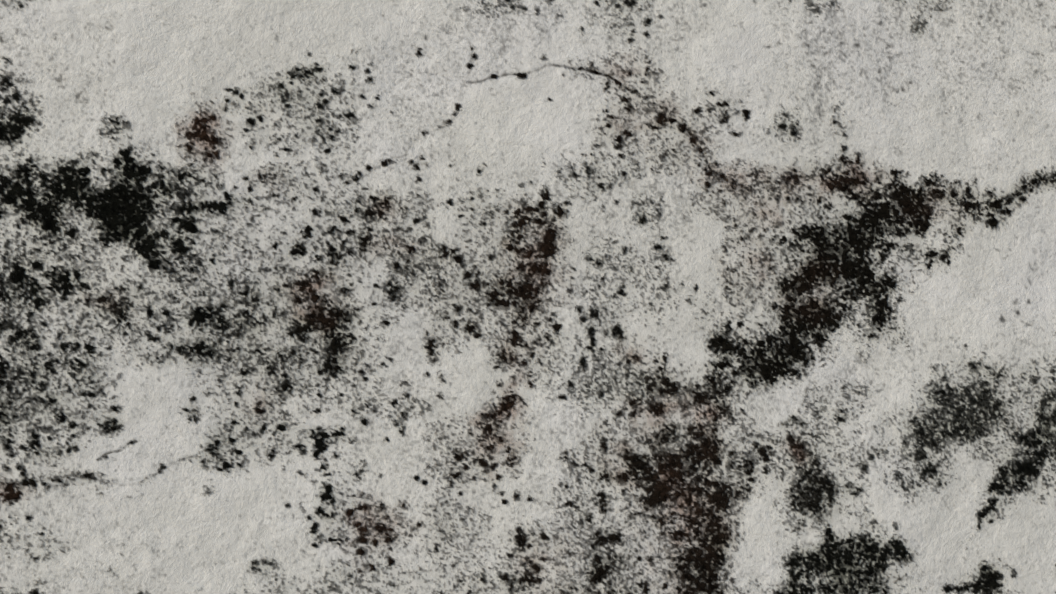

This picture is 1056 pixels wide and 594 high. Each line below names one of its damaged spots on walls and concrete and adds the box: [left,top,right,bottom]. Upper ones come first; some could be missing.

damp [0,72,41,150]
damp [224,53,358,156]
crack [338,103,461,184]
crack [467,47,750,189]
damp [0,101,977,594]
crack [2,441,135,494]
damp [885,352,1056,529]
damp [943,559,1017,594]